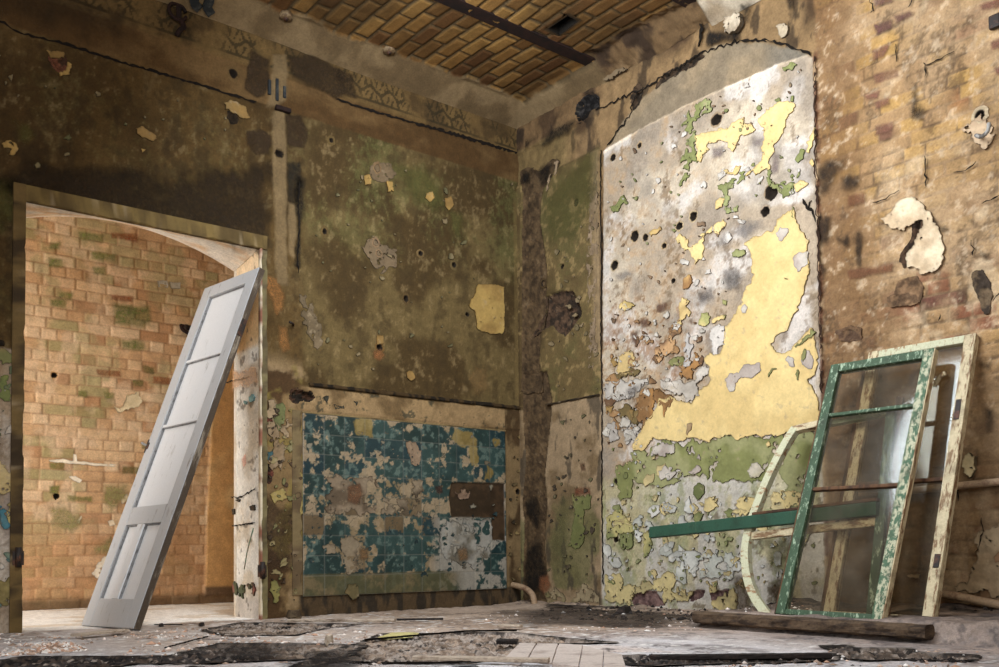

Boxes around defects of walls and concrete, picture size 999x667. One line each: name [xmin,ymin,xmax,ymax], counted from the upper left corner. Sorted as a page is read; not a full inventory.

crack [0,21,257,103]
spalling [655,54,705,89]
peeling [962,105,996,150]
water stain [522,164,551,185]
peeling [881,196,946,308]
spalling [464,278,505,334]
peeling [508,62,820,610]
crack [557,23,823,584]
peeling [312,473,497,571]
water stain [526,498,538,528]
water stain [524,545,545,590]
peeling [954,523,999,598]